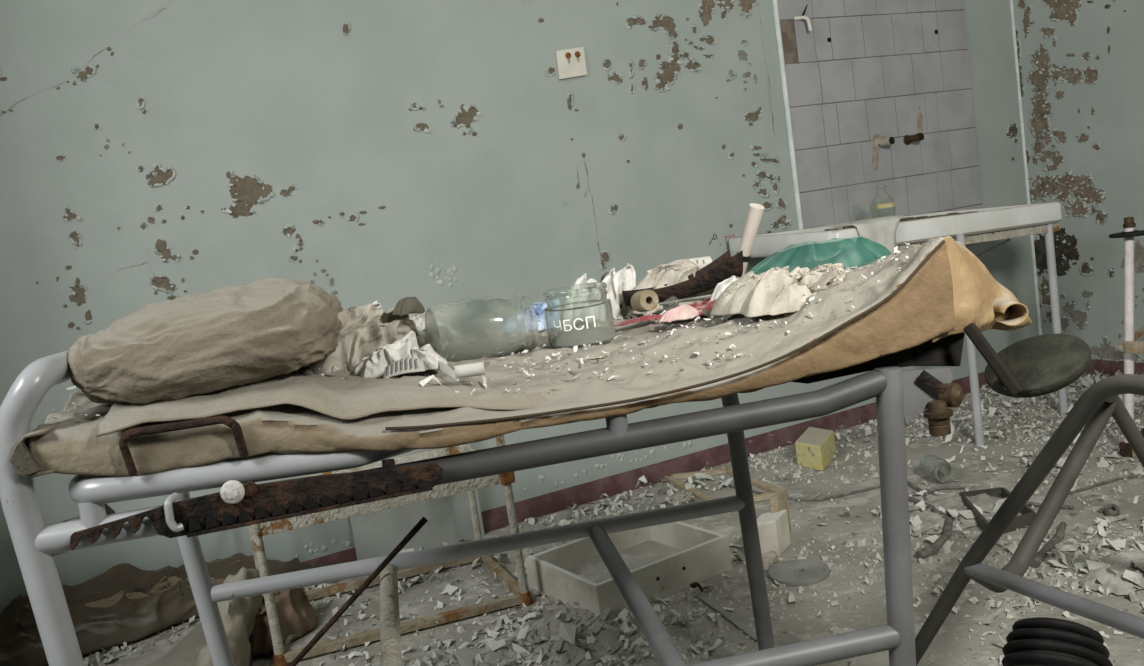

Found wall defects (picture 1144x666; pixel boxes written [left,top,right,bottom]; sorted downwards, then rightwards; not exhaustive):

peeling [56,64,99,90]
crack [0,0,171,116]
peeling [409,99,481,136]
peeling [140,204,167,229]
peeling [138,162,176,188]
peeling [221,171,297,218]
peeling [742,145,792,233]
peeling [150,239,199,300]
peeling [56,265,93,331]